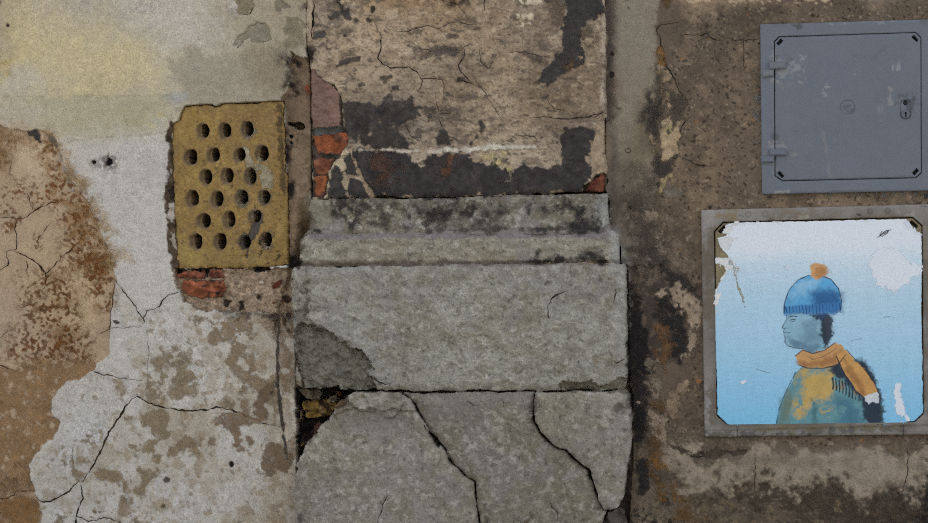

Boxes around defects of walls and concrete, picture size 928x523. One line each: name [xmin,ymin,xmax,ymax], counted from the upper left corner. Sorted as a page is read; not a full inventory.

crack [0,165,78,308]
flaking render [28,129,57,147]
flaking render [164,121,391,472]
flaking render [289,69,547,200]
crack [373,0,603,144]
peeling [582,119,612,228]
crack [0,278,280,523]
leakage [635,459,650,495]
leakage [733,468,927,523]